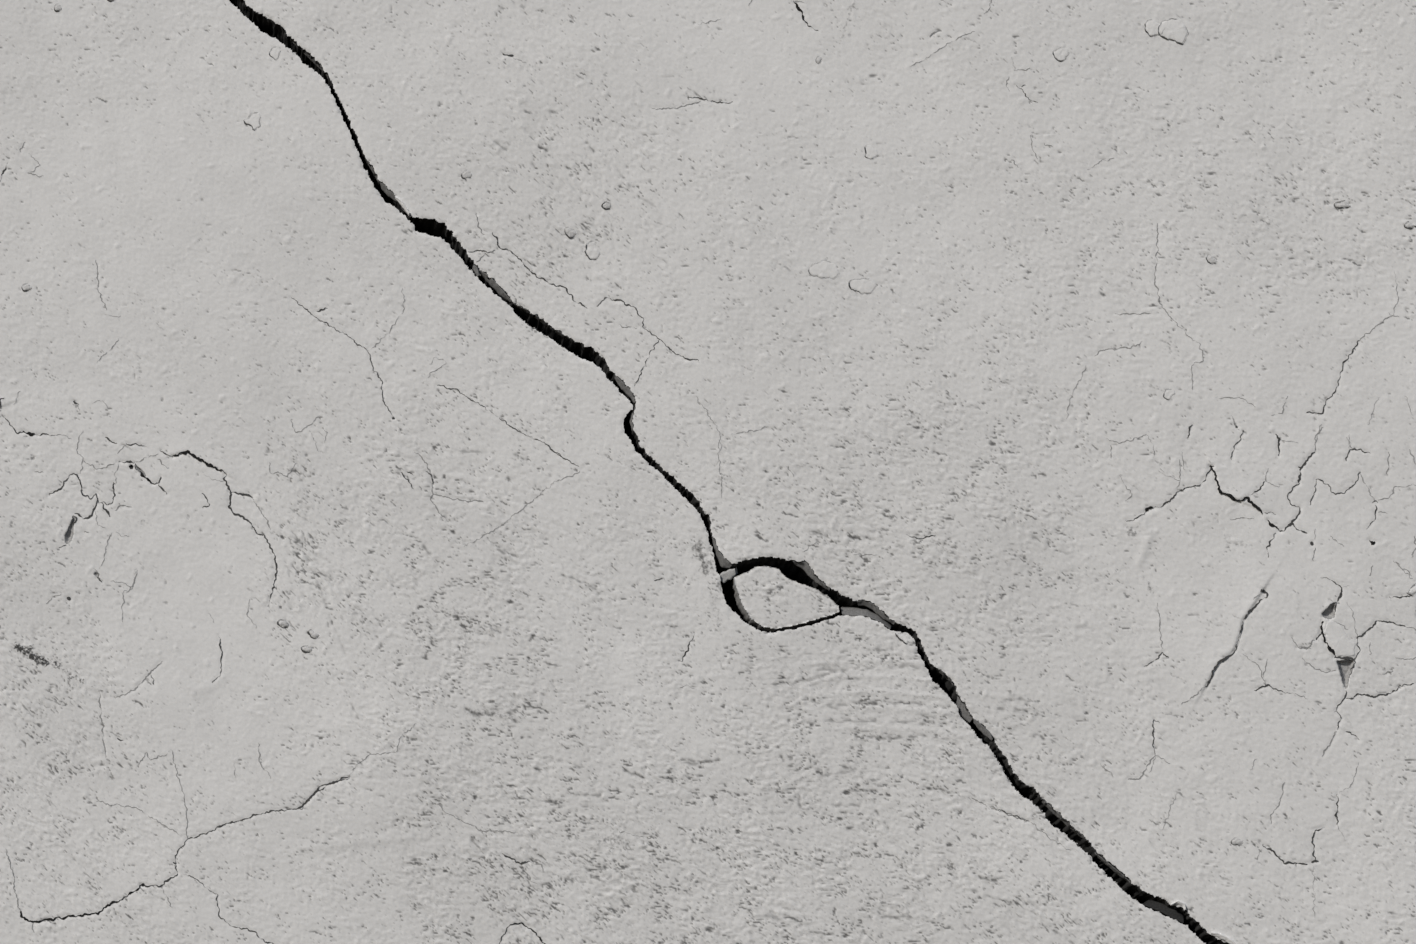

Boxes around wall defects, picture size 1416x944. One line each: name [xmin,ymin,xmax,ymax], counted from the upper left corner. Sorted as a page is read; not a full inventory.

crack [95,260,120,361]
crack [5,391,327,683]
crack [229,0,1236,944]
crack [1066,223,1416,914]
crack [5,663,416,944]